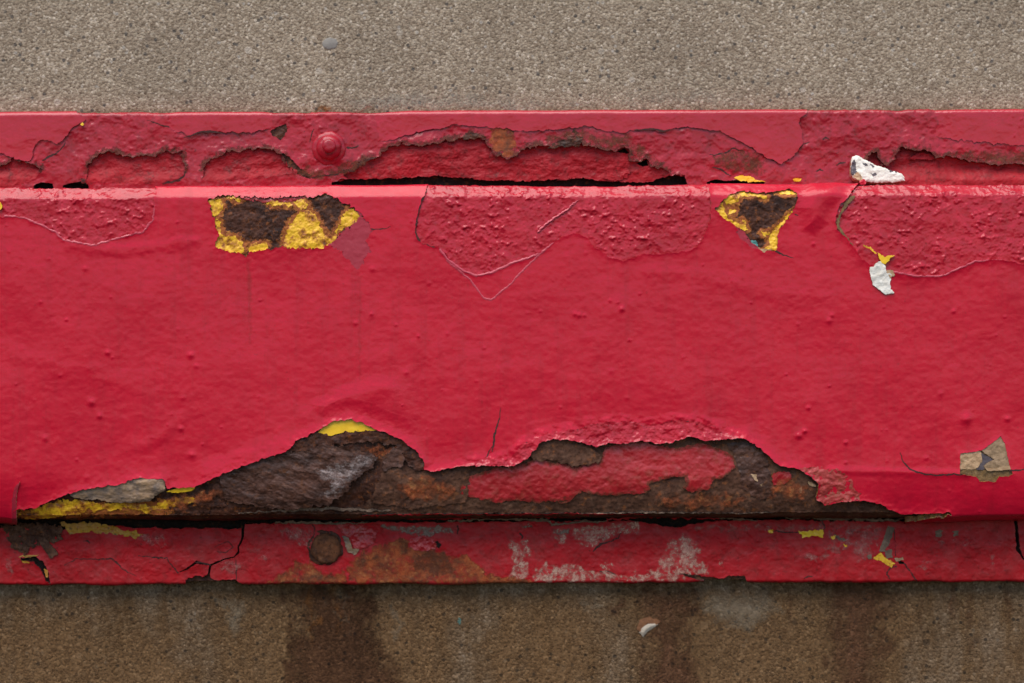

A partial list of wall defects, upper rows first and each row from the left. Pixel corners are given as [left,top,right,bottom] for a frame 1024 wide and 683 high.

peeling [0,156,43,188]
peeling [81,124,311,186]
peeling [339,129,685,183]
peeling [864,144,1024,186]
peeling [208,195,372,270]
peeling [715,190,798,252]
peeling [863,245,895,295]
peeling [960,436,1012,482]
peeling [11,419,925,583]
crack [20,520,247,582]
corrosion [209,538,529,683]